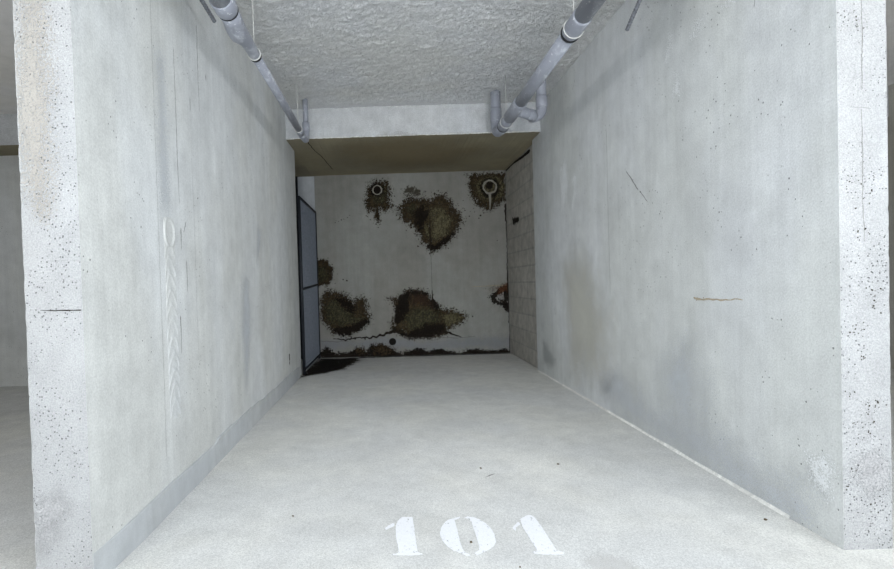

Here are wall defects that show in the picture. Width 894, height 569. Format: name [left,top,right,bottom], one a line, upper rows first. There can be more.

corrosion [487,283,508,313]
crack [322,330,475,342]